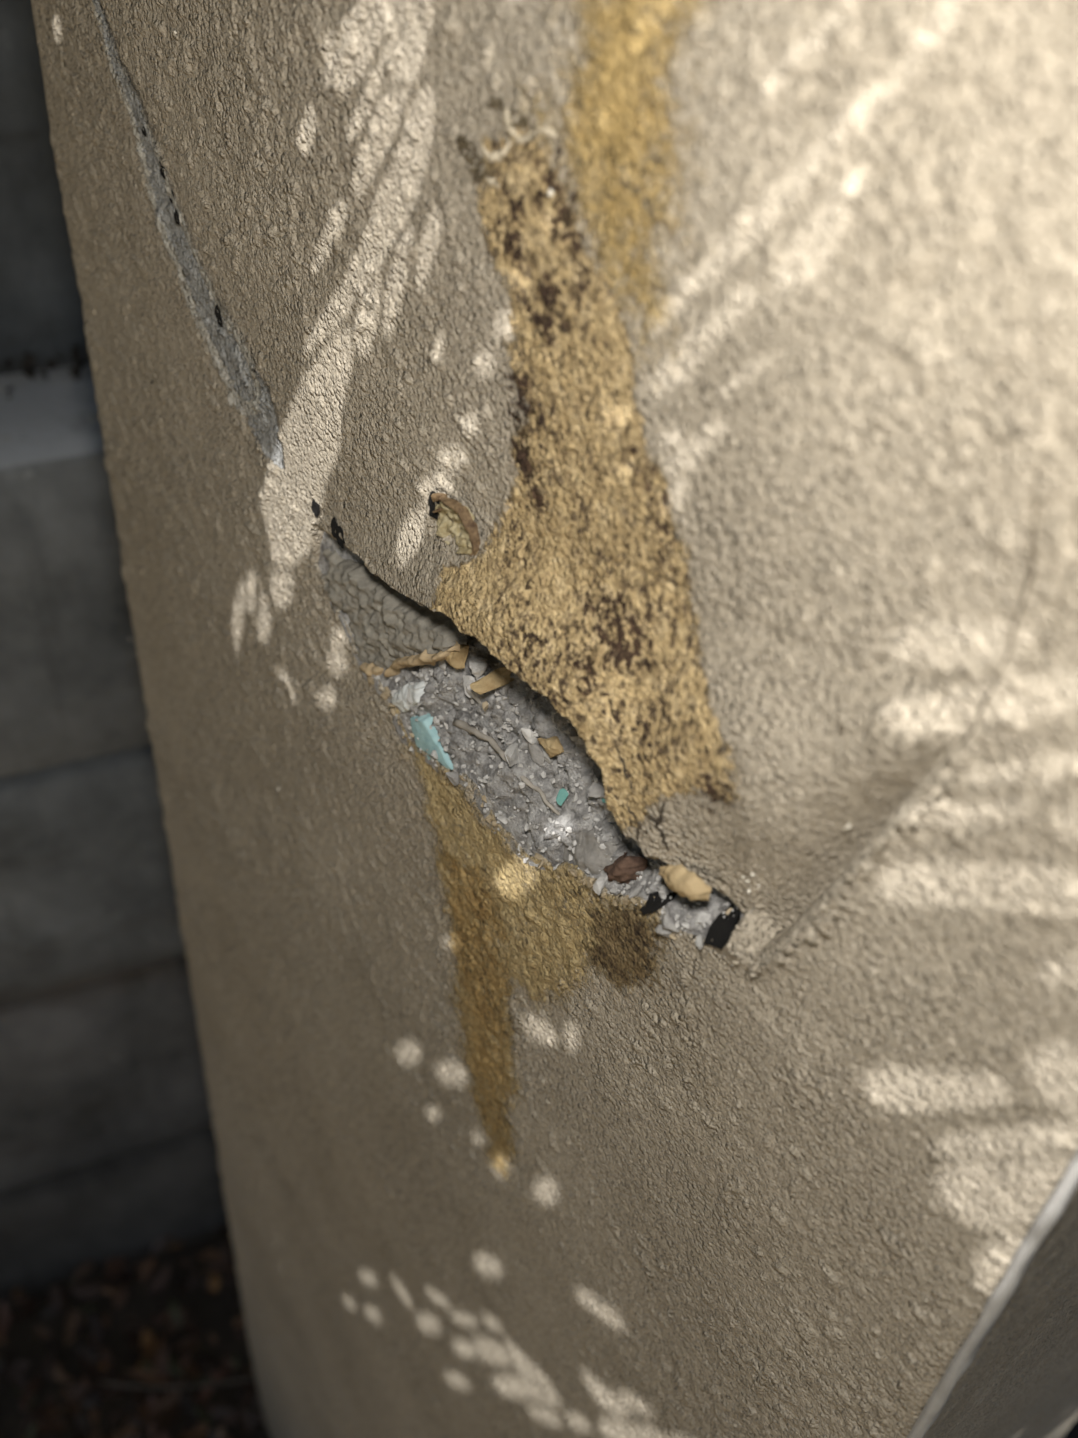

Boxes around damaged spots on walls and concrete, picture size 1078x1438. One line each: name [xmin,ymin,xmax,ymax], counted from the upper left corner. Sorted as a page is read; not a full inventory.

crack [90,0,284,469]
corrosion [528,0,701,342]
crack [311,500,345,549]
corrosion [396,709,665,1175]
flaking render [318,127,753,950]
crack [732,443,1047,978]